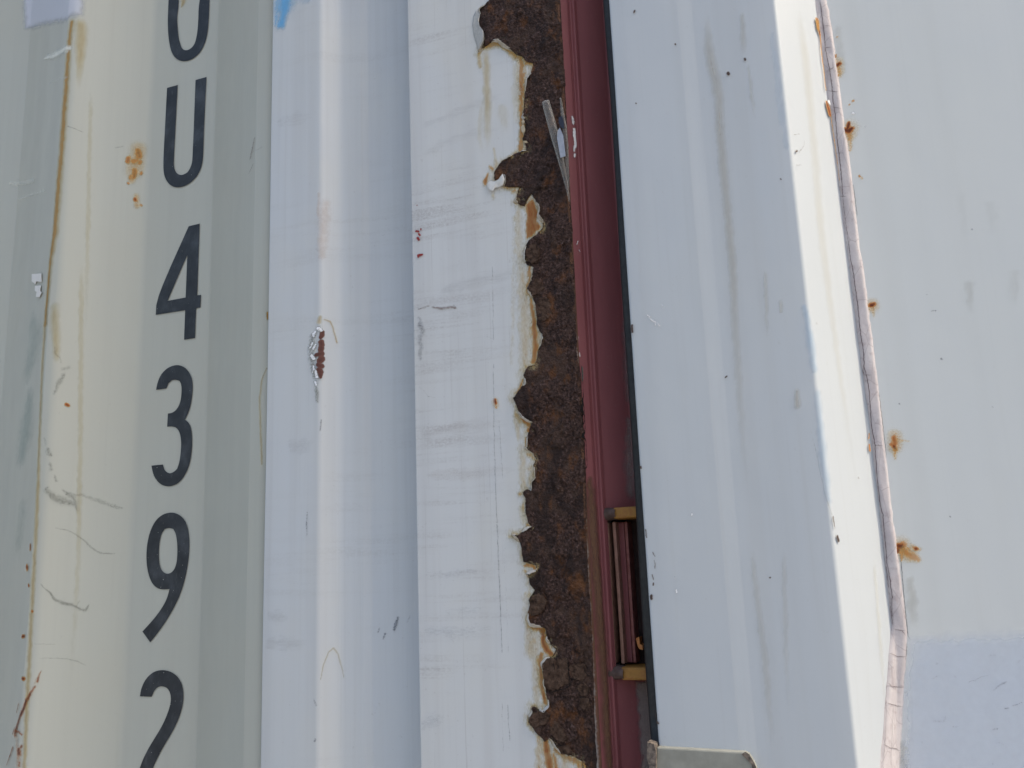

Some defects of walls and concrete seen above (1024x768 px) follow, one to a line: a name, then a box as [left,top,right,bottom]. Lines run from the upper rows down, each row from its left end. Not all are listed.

rust [816,18,842,88]
rust [125,148,143,184]
rust [826,101,855,181]
peeling [309,326,325,386]
rust [472,0,597,768]
rust [889,434,906,457]
rust [896,541,920,561]